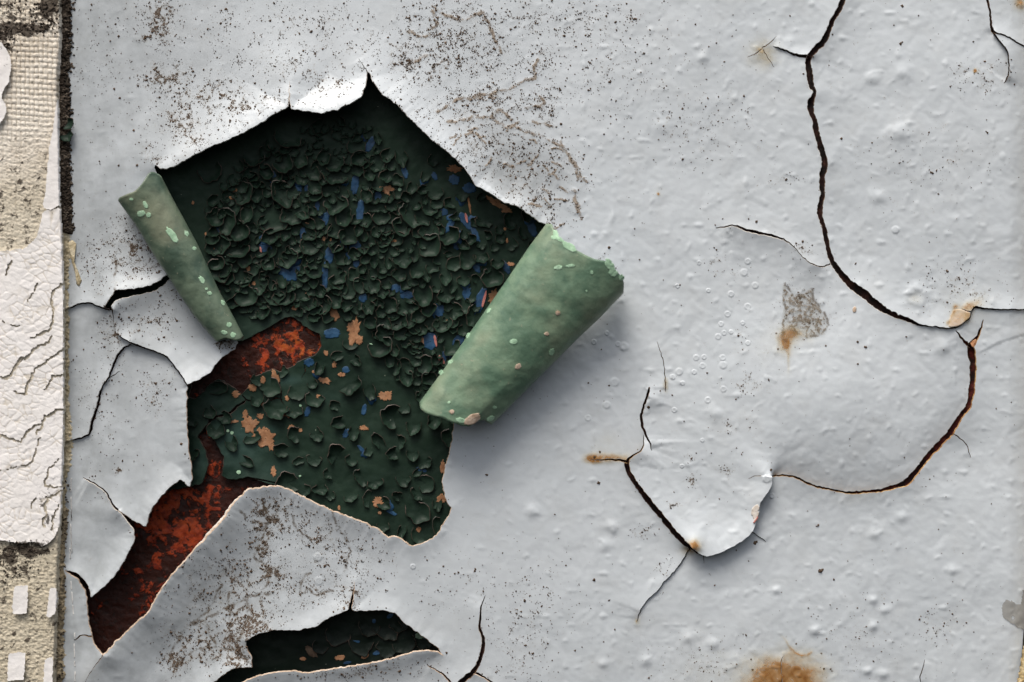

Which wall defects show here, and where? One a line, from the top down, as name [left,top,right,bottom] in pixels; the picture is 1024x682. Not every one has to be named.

crack [0,100,190,546]
rust [67,317,321,653]
peeling [64,72,624,655]
rust [586,455,620,463]
crack [591,342,707,622]
crack [716,0,1024,494]
peeling [214,582,444,682]
crack [427,597,492,682]
rust [751,648,814,682]